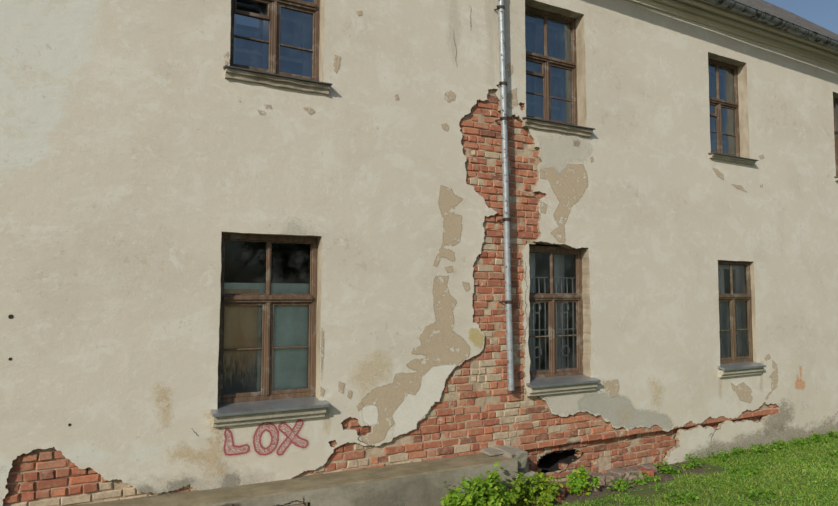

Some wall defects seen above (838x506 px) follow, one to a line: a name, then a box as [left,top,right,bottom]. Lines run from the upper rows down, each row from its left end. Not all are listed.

flaking render [3,447,197,506]
flaking render [295,89,779,483]